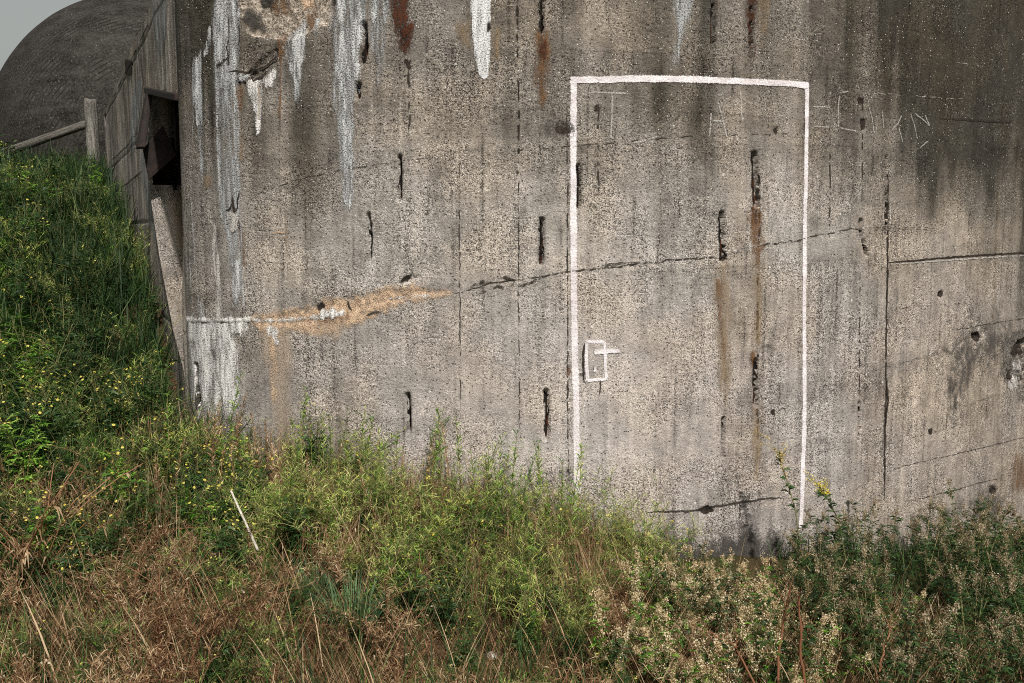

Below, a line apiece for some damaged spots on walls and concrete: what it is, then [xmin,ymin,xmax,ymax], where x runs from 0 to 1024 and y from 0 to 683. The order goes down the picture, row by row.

efflorescence [191,0,244,305]
efflorescence [285,0,388,210]
corrosion [390,0,414,128]
corrosion [535,14,550,105]
crack [452,0,1024,502]
corrosion [748,179,763,363]
water stain [188,320,237,410]
spalling [998,328,1024,402]
crack [648,497,780,513]